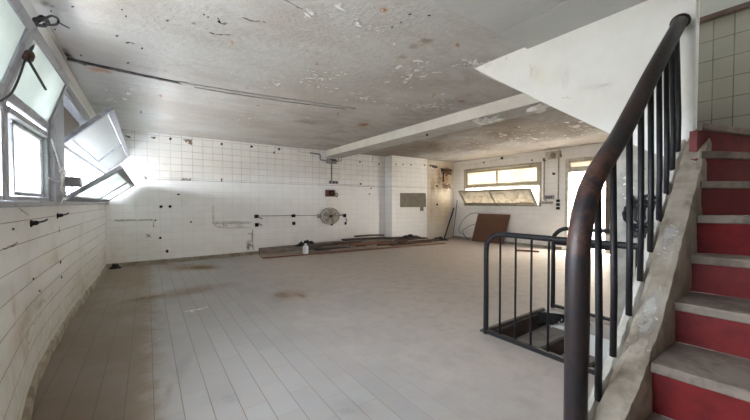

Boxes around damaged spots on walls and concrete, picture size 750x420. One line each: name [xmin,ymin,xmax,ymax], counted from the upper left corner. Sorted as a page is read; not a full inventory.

spalling [526,103,550,113]